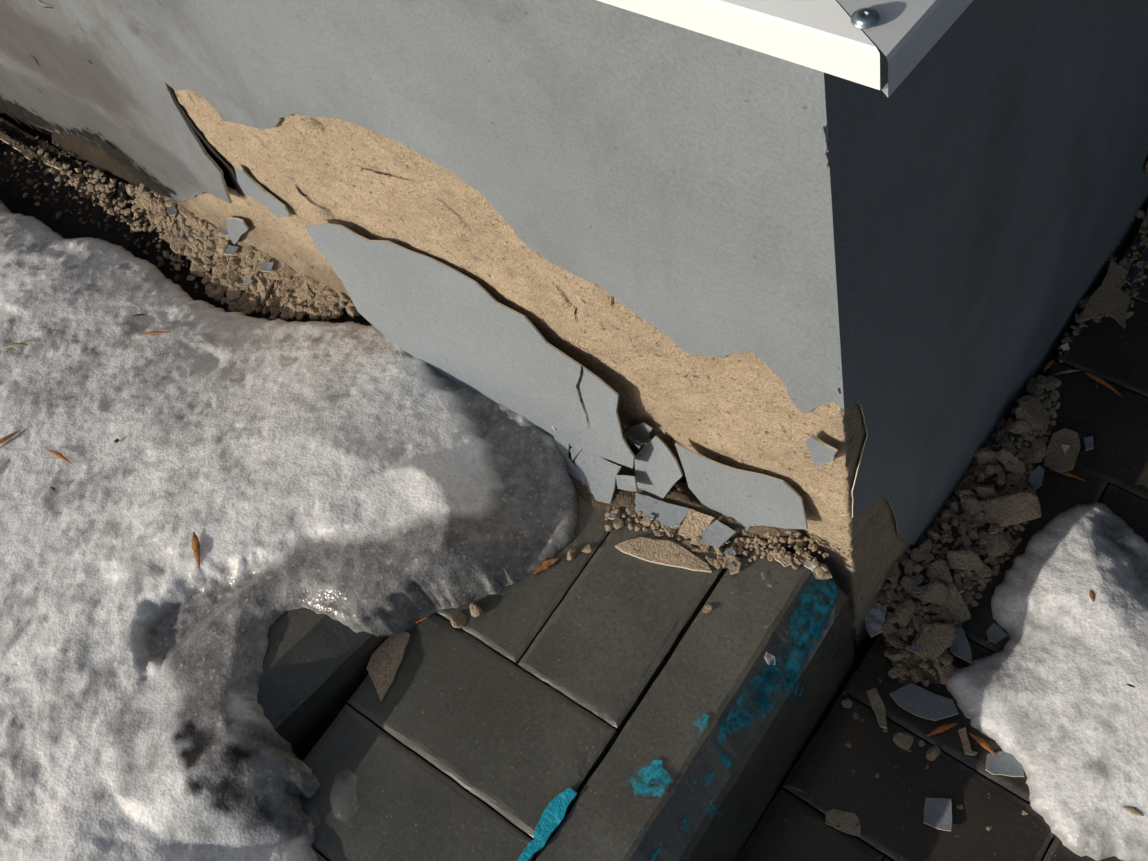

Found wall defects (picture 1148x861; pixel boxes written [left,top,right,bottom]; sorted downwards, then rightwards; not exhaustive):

spalling [51,86,913,649]